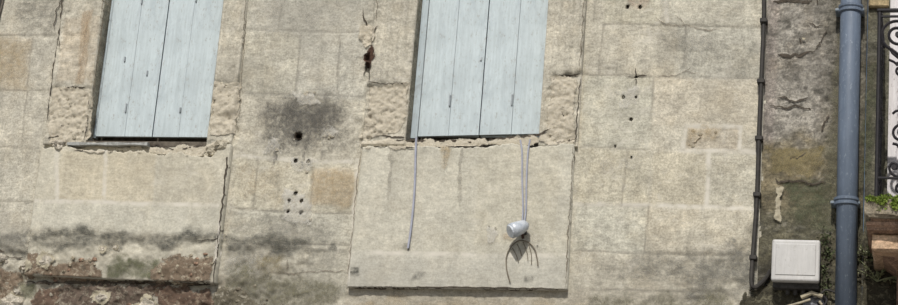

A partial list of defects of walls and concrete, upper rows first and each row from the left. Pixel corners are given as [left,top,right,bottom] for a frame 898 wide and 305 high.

crack [47,0,63,117]
crack [91,0,108,117]
crack [236,0,247,132]
corrosion [363,45,375,68]
crack [125,142,204,150]
crack [25,157,228,301]
peeling [0,253,268,305]